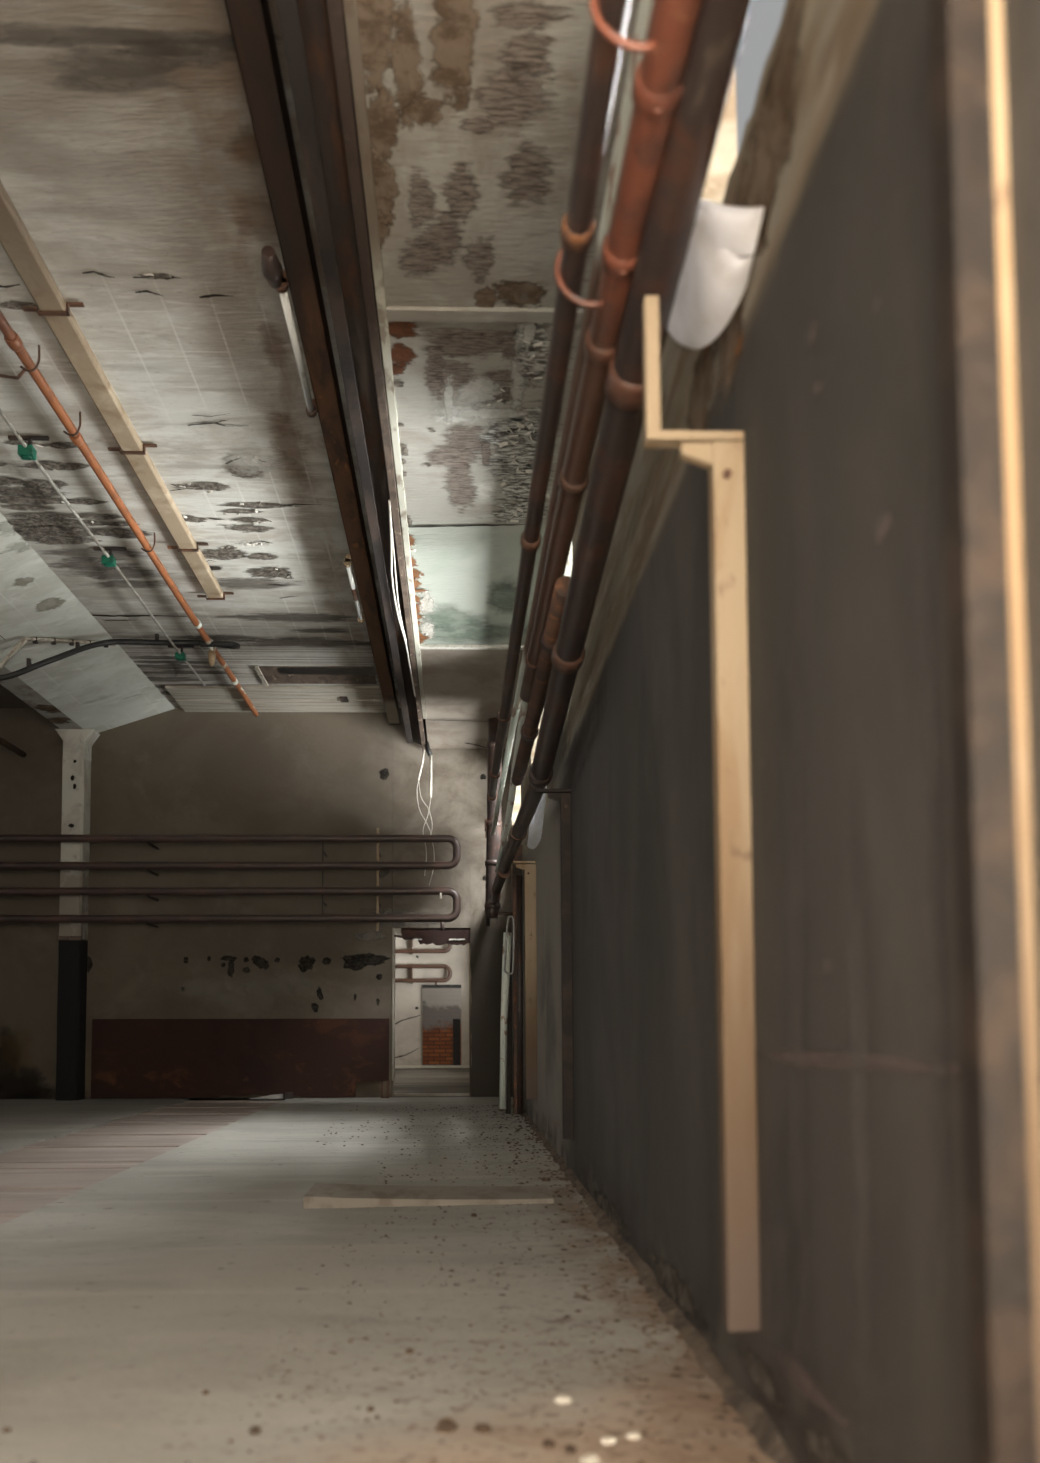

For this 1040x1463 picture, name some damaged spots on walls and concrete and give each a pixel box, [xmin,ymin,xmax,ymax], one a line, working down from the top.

spalling [474,280,547,308]
peeling [480,323,550,523]
spalling [398,423,408,476]
leakage [46,548,167,588]
spalling [207,956,280,977]
spalling [298,953,389,980]